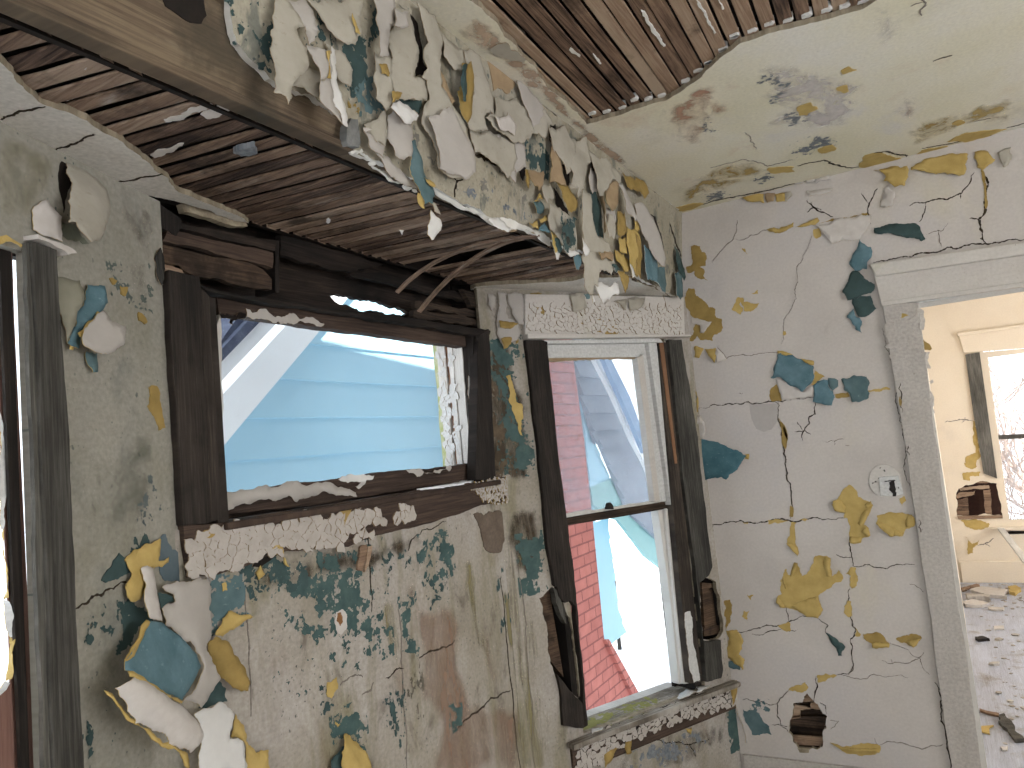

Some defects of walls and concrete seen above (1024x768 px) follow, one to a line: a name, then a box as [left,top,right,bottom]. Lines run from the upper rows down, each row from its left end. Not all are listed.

leakage [674,90,710,121]
peeling [269,0,727,363]
leakage [687,167,758,199]
crack [703,133,856,358]
peeling [767,120,1012,333]
crack [873,170,1024,263]
crack [710,393,849,531]
peeling [769,351,902,406]
crack [895,383,910,484]
spalling [956,421,1002,554]
peeling [101,534,270,768]
crack [739,542,952,767]